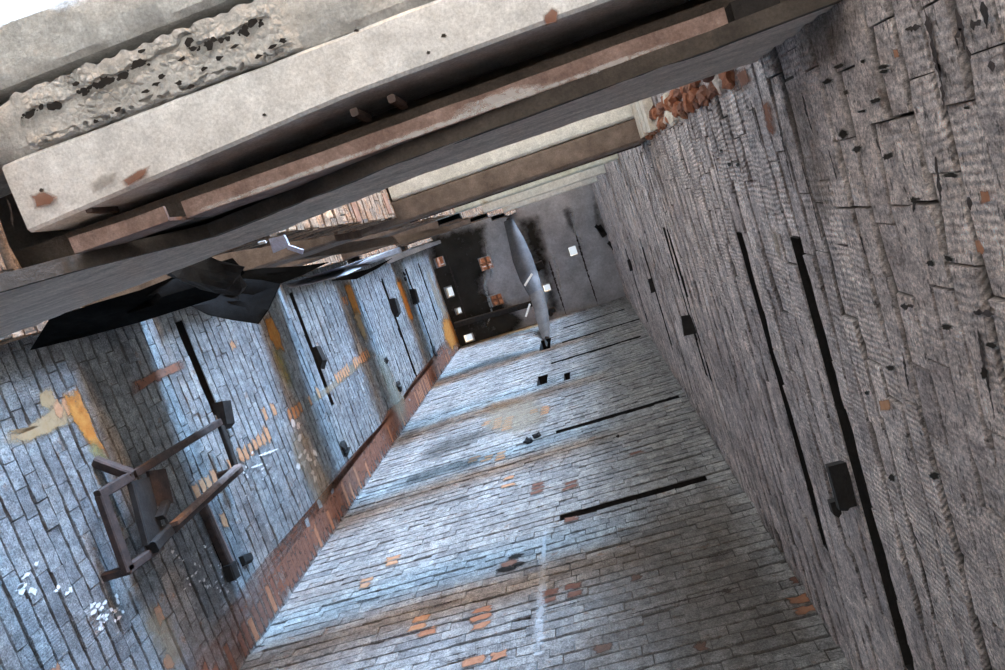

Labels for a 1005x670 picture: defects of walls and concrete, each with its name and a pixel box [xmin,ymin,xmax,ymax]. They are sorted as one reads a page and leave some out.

spalling [9,0,304,151]
spalling [631,69,735,140]
leakage [521,220,557,308]
crack [900,302,914,310]
crack [902,357,910,390]
peeling [11,398,72,441]
peeling [171,342,459,670]
peeling [469,605,492,631]